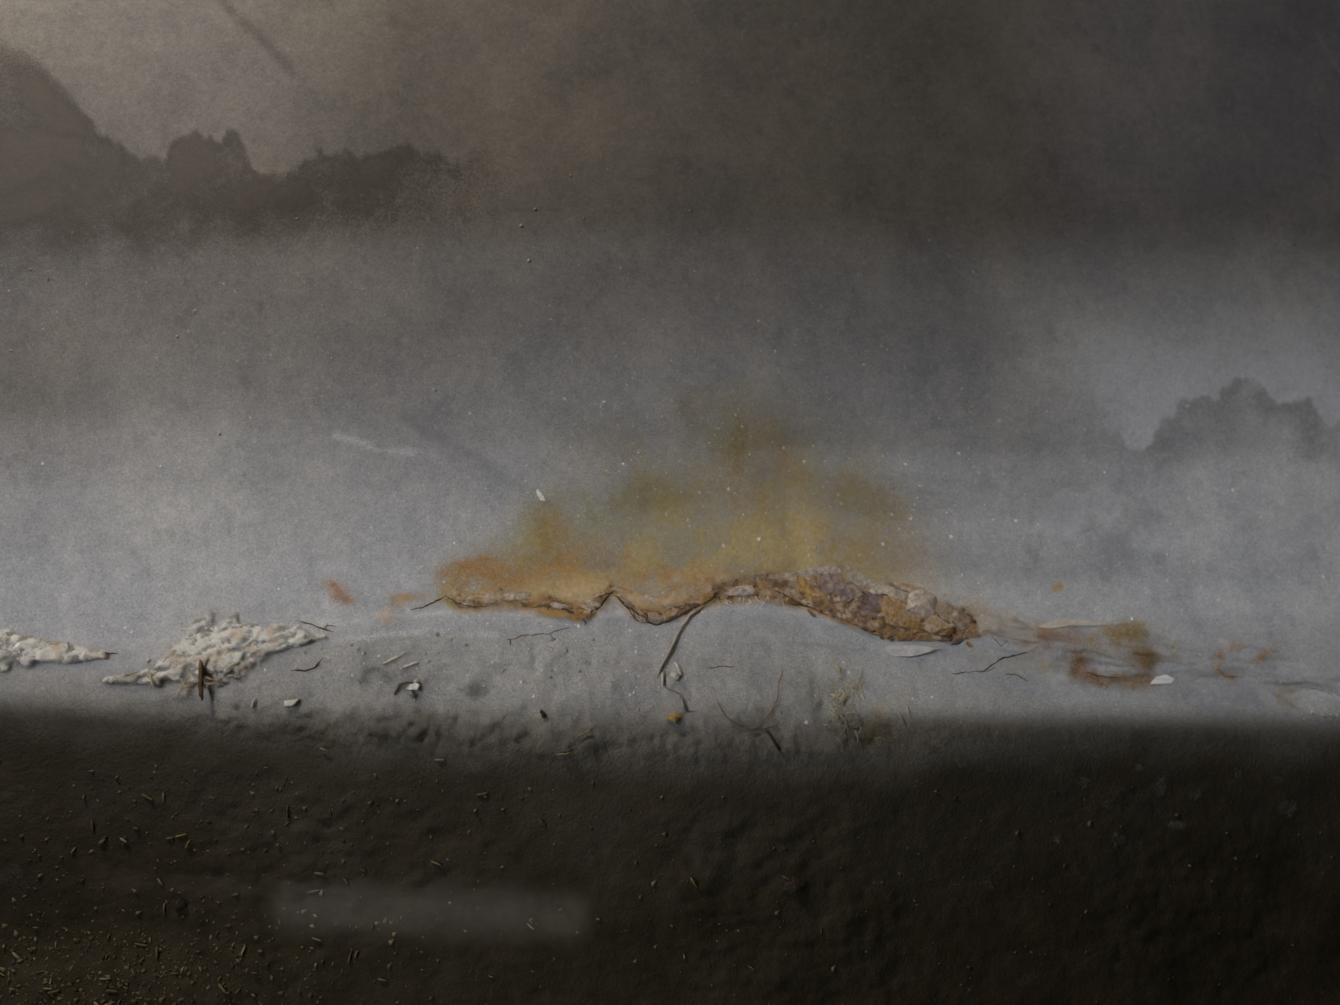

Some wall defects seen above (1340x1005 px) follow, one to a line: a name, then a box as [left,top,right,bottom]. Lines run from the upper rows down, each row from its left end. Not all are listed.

water stain [0,39,509,303]
corrosion [382,561,981,647]
corrosion [1038,615,1185,693]